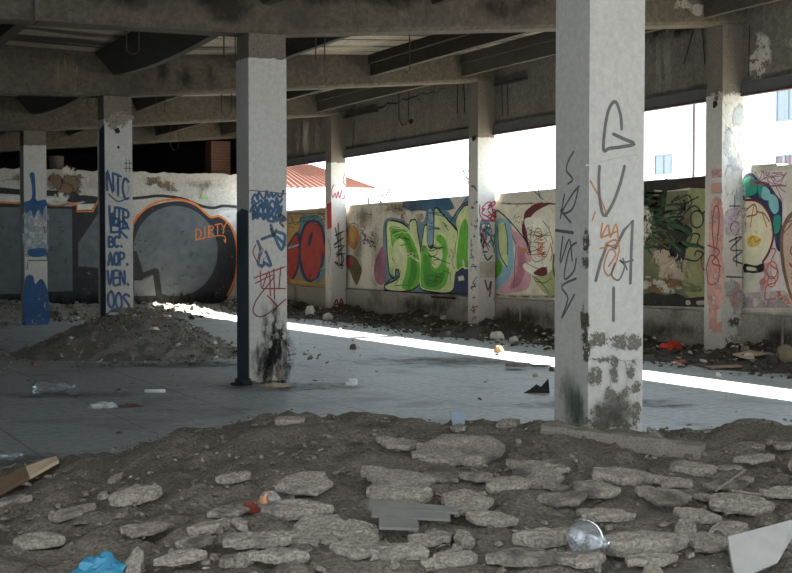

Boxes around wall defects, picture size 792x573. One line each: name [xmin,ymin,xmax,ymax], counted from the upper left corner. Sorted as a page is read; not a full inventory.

spalling [674,0,704,17]
peeling [747,26,772,80]
peeling [104,111,135,134]
leakage [257,314,291,381]